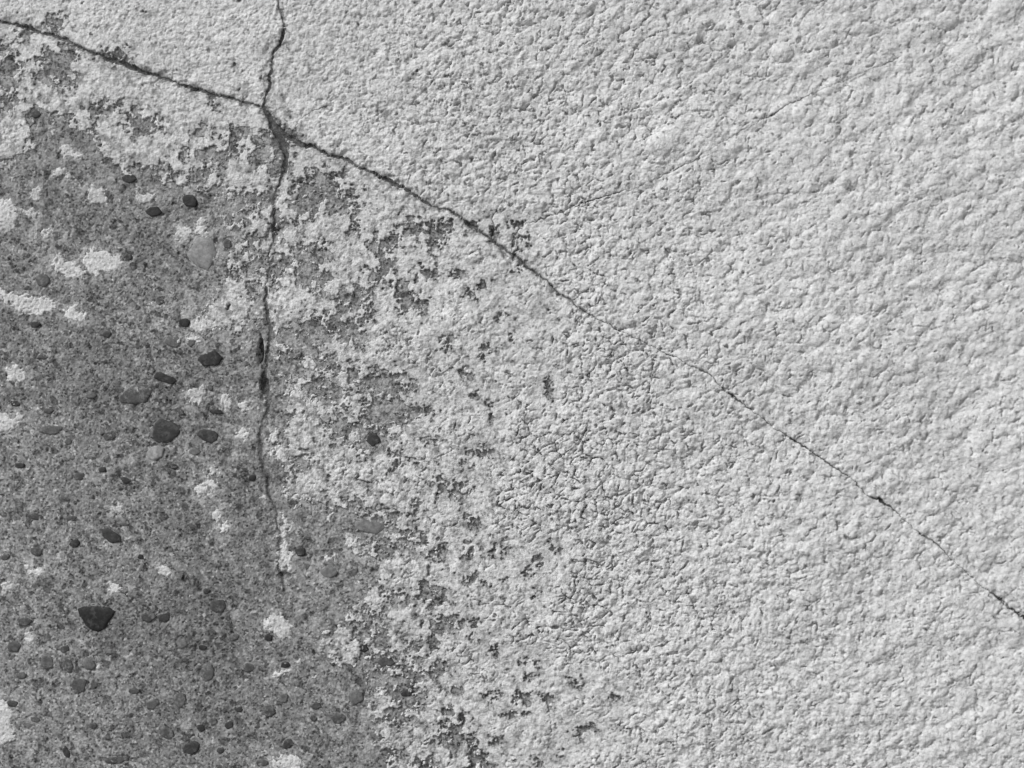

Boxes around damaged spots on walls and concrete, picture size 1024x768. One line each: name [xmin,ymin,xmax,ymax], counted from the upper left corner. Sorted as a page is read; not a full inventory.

crack [0,0,900,596]
peeling [0,11,532,768]
peeling [522,538,563,600]
crack [853,480,1024,619]
peeling [481,656,554,719]
peeling [567,722,600,743]